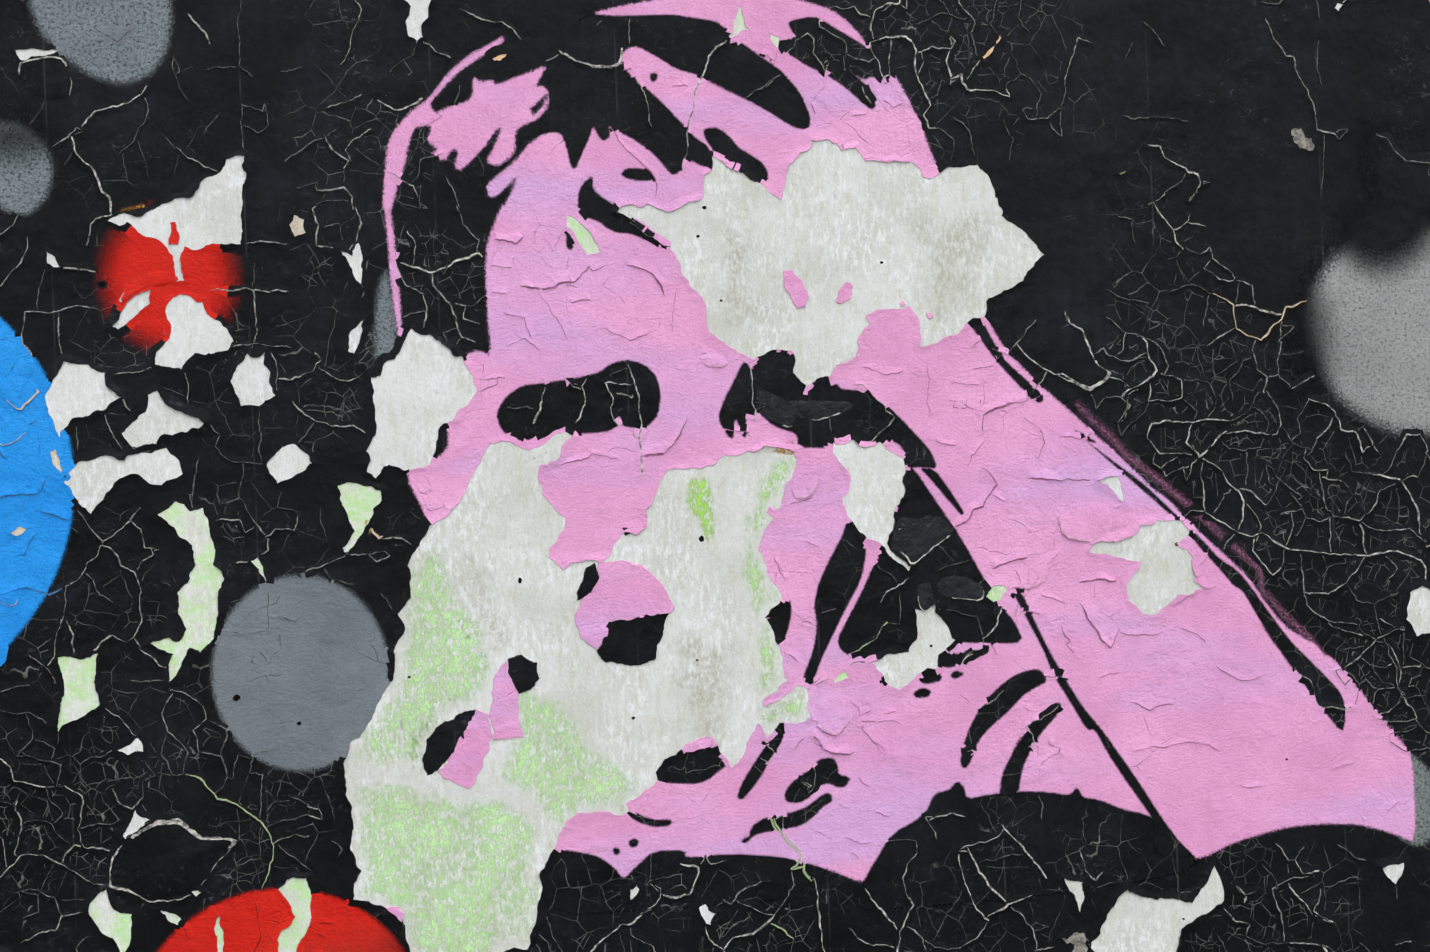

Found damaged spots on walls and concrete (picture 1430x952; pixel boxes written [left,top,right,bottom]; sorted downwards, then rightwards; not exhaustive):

crack [457,0,1168,199]
crack [1259,0,1430,191]
peeling [44,643,109,750]
peeling [0,149,285,692]
crack [0,407,345,952]
crack [0,0,689,640]
peeling [261,235,484,566]
peeling [332,127,1053,952]
crack [529,111,1430,952]
peeling [82,883,231,952]
peeling [266,868,323,952]
peeling [1055,857,1232,952]